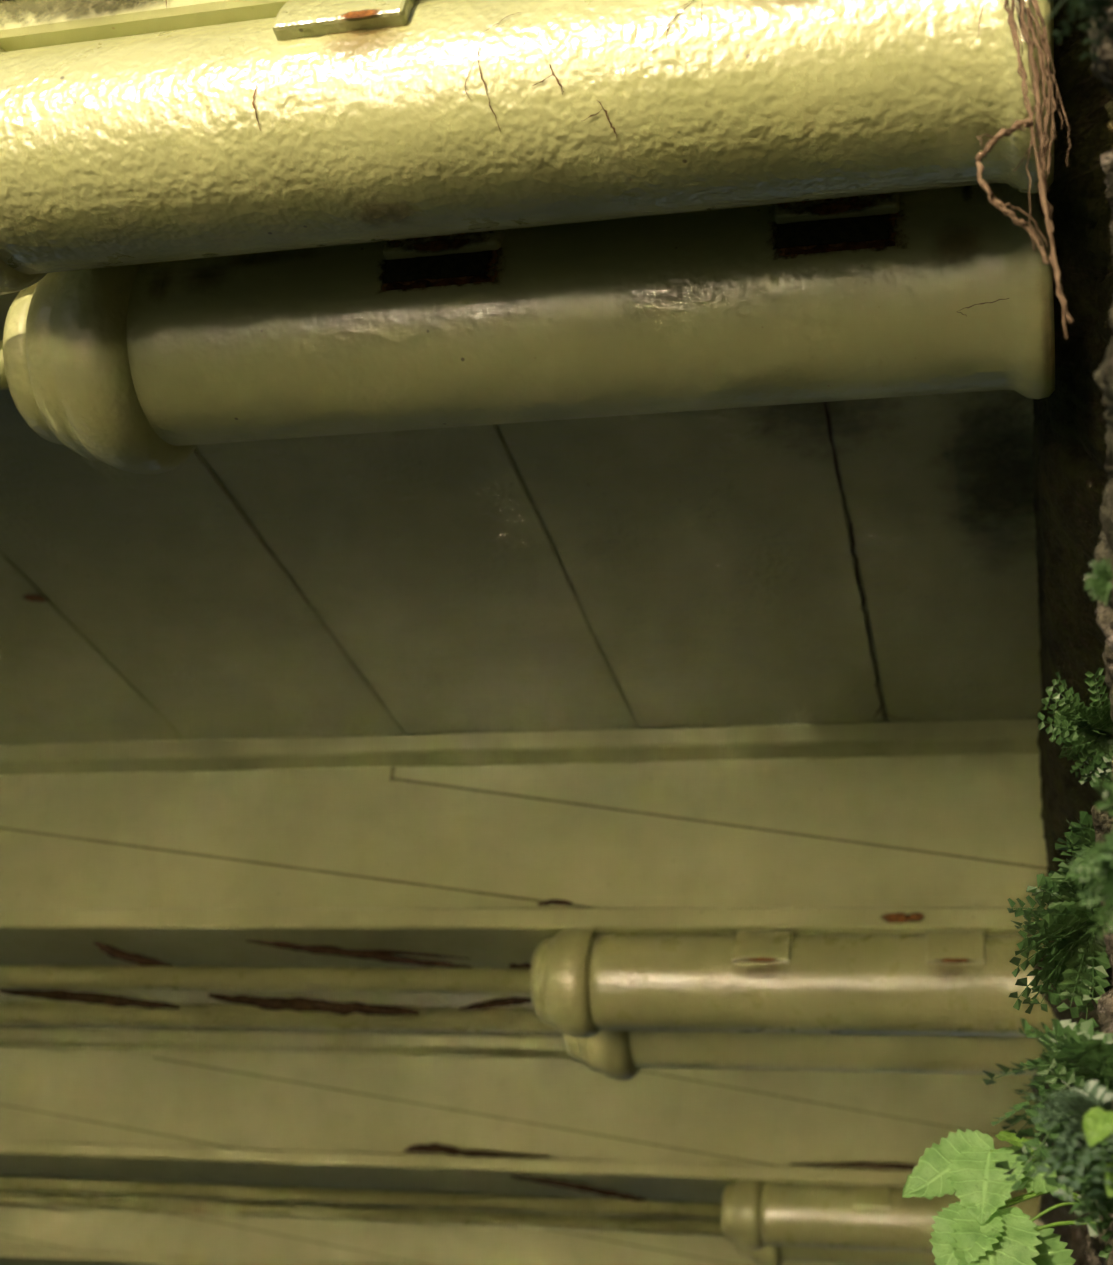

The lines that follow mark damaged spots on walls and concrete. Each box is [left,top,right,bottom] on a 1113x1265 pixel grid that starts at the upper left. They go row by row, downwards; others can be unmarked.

rust [339,9,379,19]
rust [882,912,924,923]